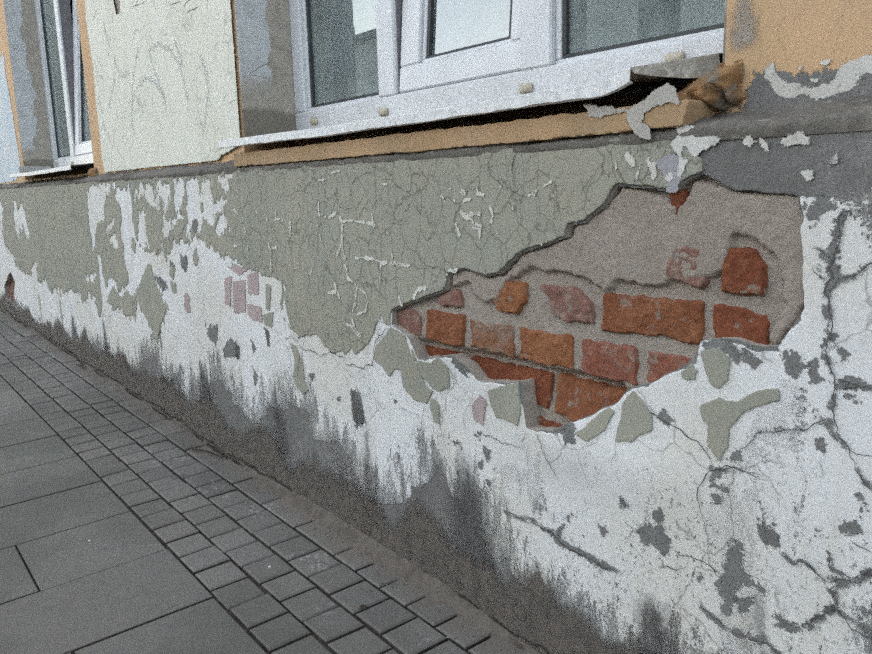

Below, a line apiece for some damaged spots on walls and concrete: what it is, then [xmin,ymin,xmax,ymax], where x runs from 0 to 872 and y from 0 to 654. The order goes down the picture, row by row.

peeling [583,83,680,140]
peeling [646,124,721,193]
peeling [743,136,769,151]
peeling [781,131,810,147]
peeling [738,55,872,112]
crack [9,313,293,492]
peeling [0,174,872,654]
crack [637,208,872,577]
leakage [0,294,667,654]
crack [503,510,618,574]
crack [779,542,872,640]
crack [699,603,782,654]